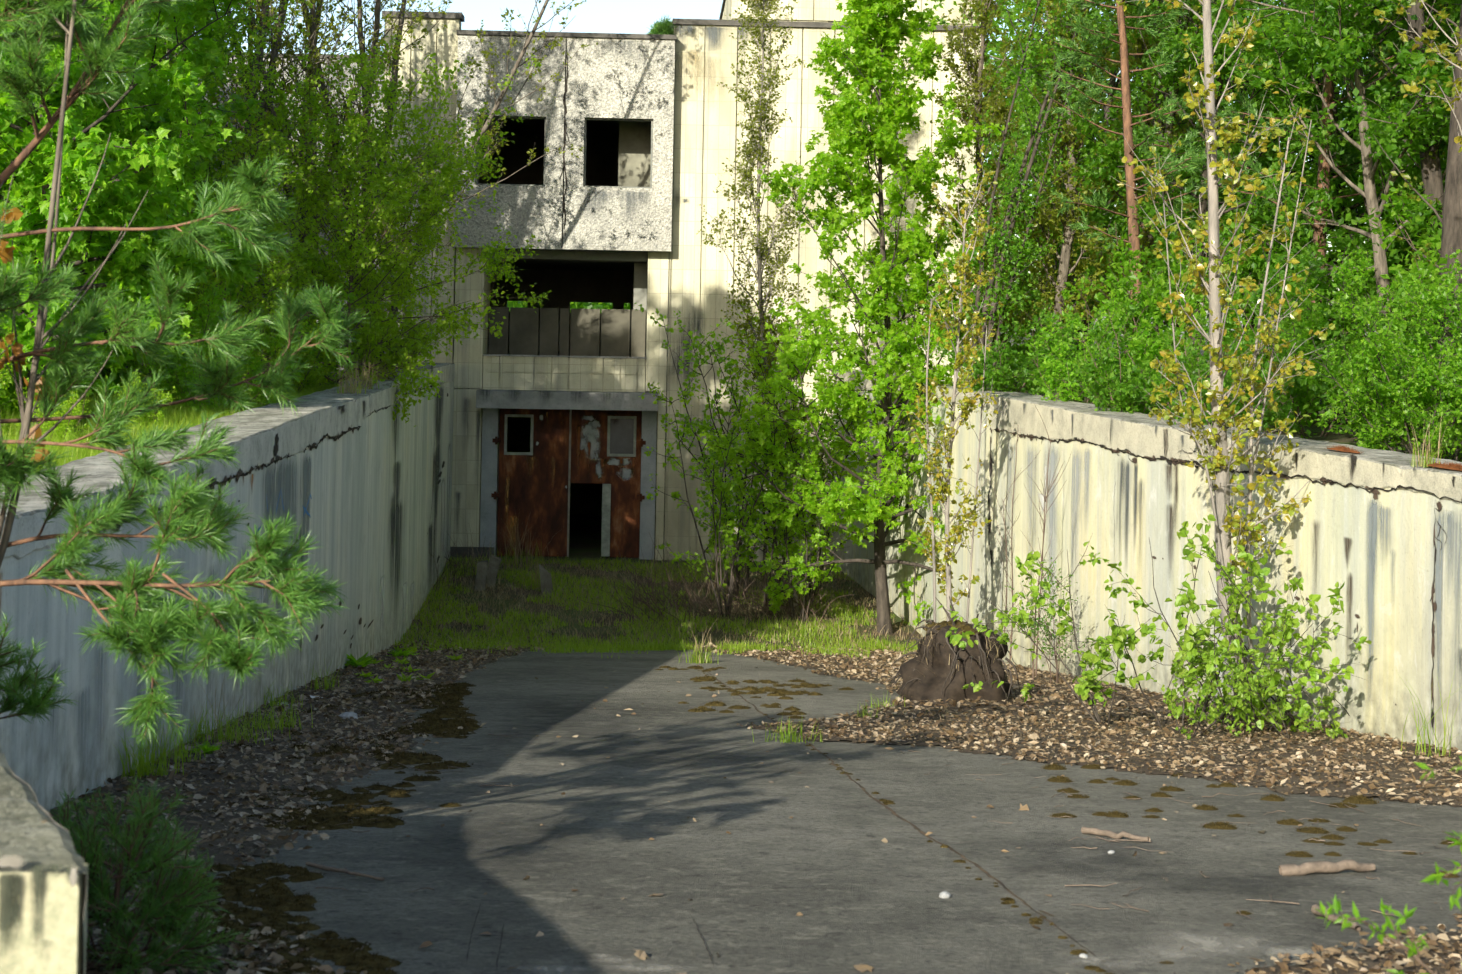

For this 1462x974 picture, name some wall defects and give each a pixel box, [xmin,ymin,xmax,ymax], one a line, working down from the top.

crack [66,386,438,575]
damp [381,370,459,612]
peeling [580,415,631,480]
damp [1008,448,1089,557]
damp [1119,461,1142,542]
damp [1167,465,1178,543]
crack [987,405,1462,737]
damp [1345,502,1390,674]
damp [1435,514,1462,680]
damp [0,865,75,943]
spalling [69,868,88,974]
crack [708,672,1125,974]